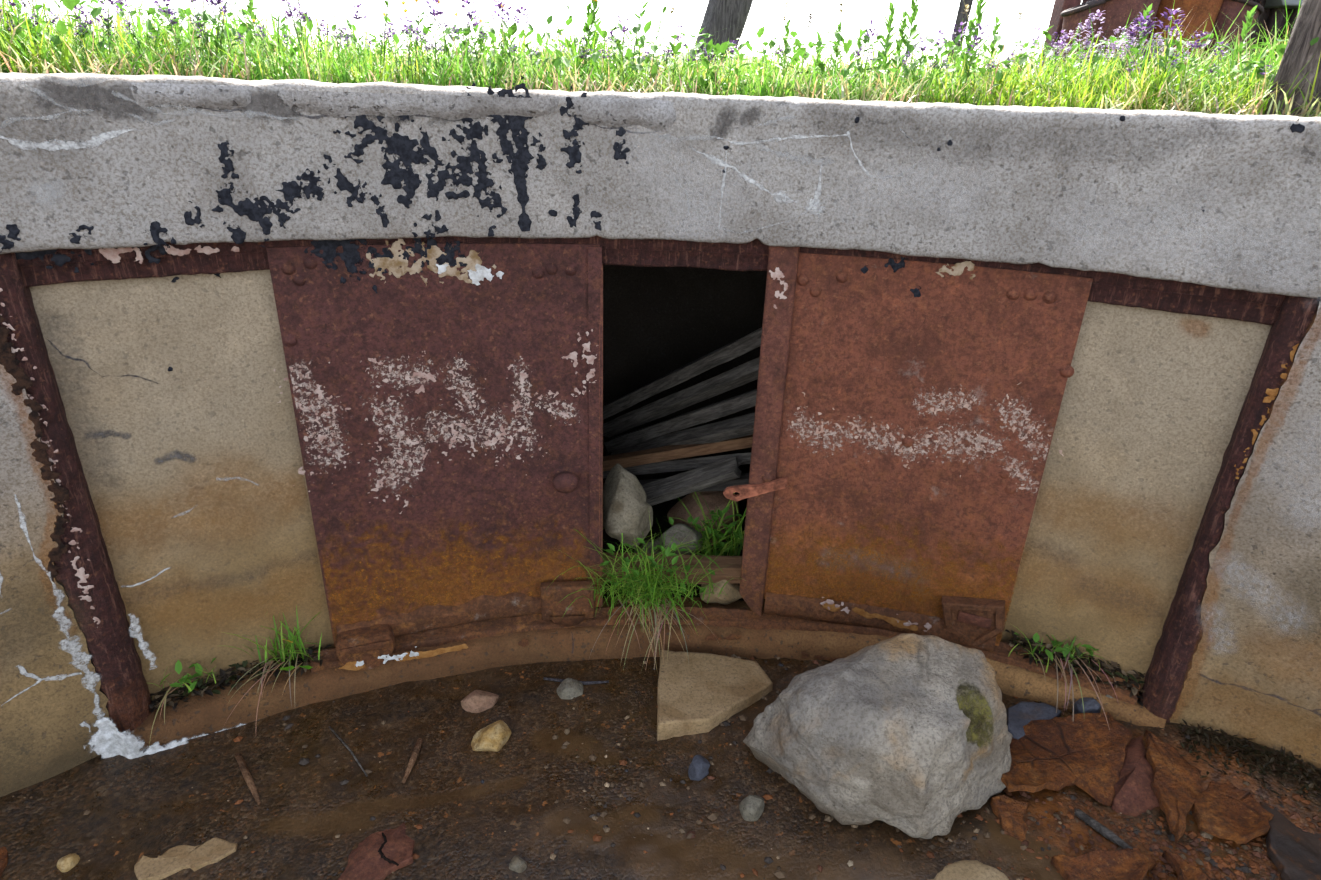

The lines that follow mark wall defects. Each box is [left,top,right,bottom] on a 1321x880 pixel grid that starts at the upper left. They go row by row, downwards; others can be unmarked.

spalling [37,78,153,118]
peeling [466,75,532,98]
peeling [0,86,589,293]
peeling [548,194,602,231]
spalling [87,430,131,439]
peeling [273,329,599,514]
spalling [156,451,195,464]
spalling [0,288,110,718]
efflorescence [47,572,246,759]
spalling [394,644,468,662]